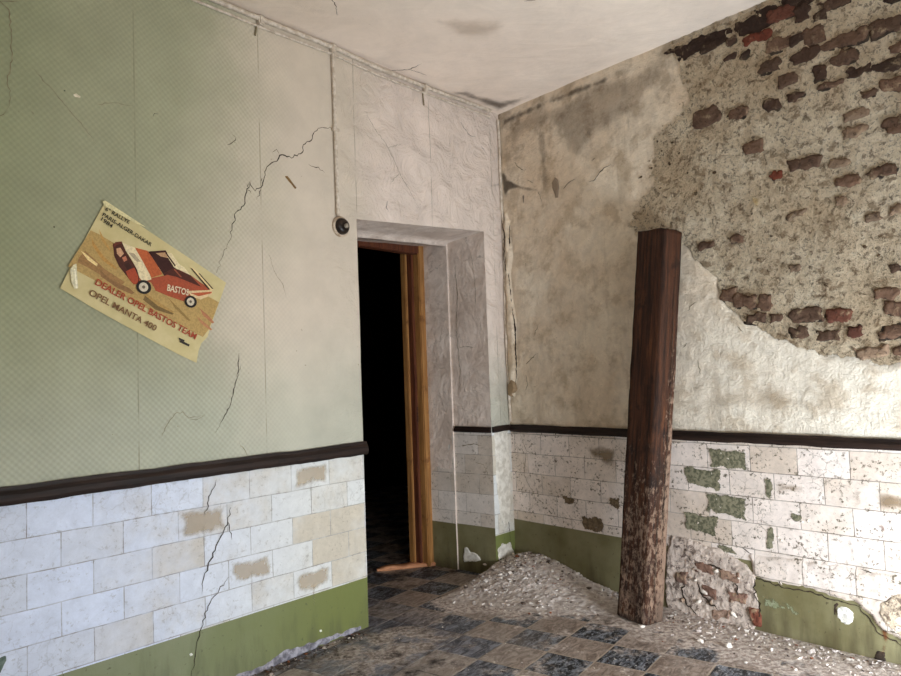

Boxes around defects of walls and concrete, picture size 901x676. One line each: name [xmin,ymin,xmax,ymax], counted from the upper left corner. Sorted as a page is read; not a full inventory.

crack [216,126,331,273]
flaking render [628,0,901,366]
crack [191,482,232,674]
flaking render [236,626,361,676]
peeling [463,547,481,562]
peeling [498,542,515,560]
flaking render [665,448,901,645]